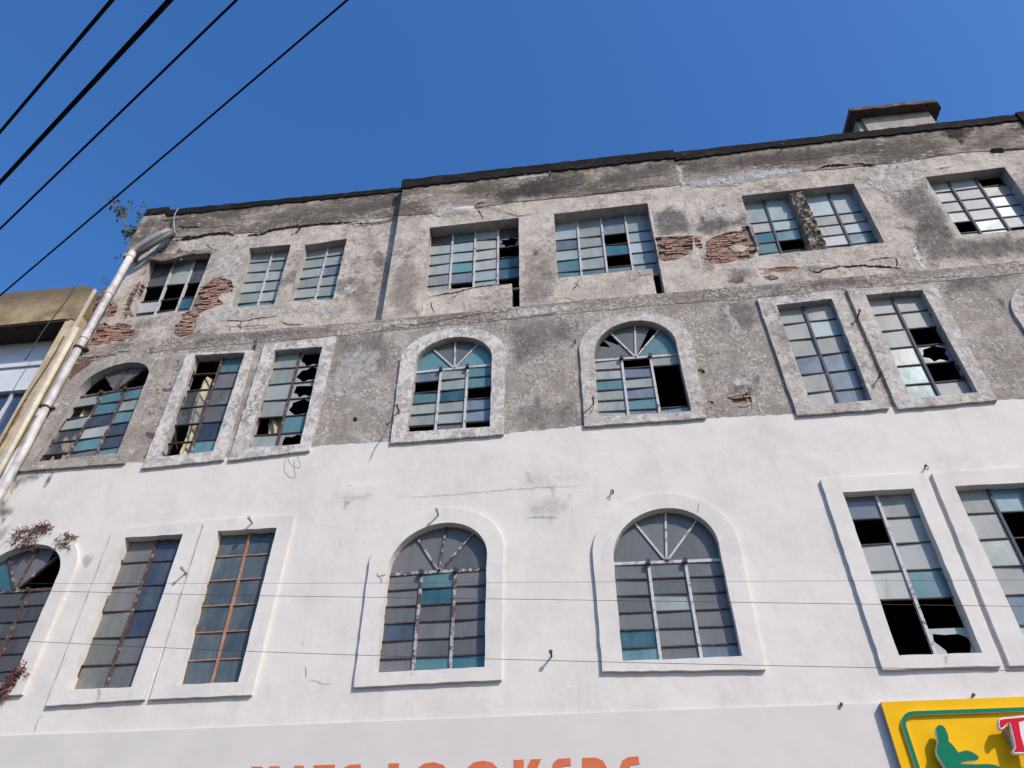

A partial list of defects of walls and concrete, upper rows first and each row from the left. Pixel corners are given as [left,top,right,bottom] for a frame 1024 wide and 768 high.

crack [796,151,877,168]
water stain [498,173,583,199]
crack [167,212,434,250]
spalling [652,166,836,284]
water stain [894,186,1024,261]
crack [809,257,899,273]
spalling [150,236,336,337]
spalling [69,282,146,380]
spalling [727,373,754,404]